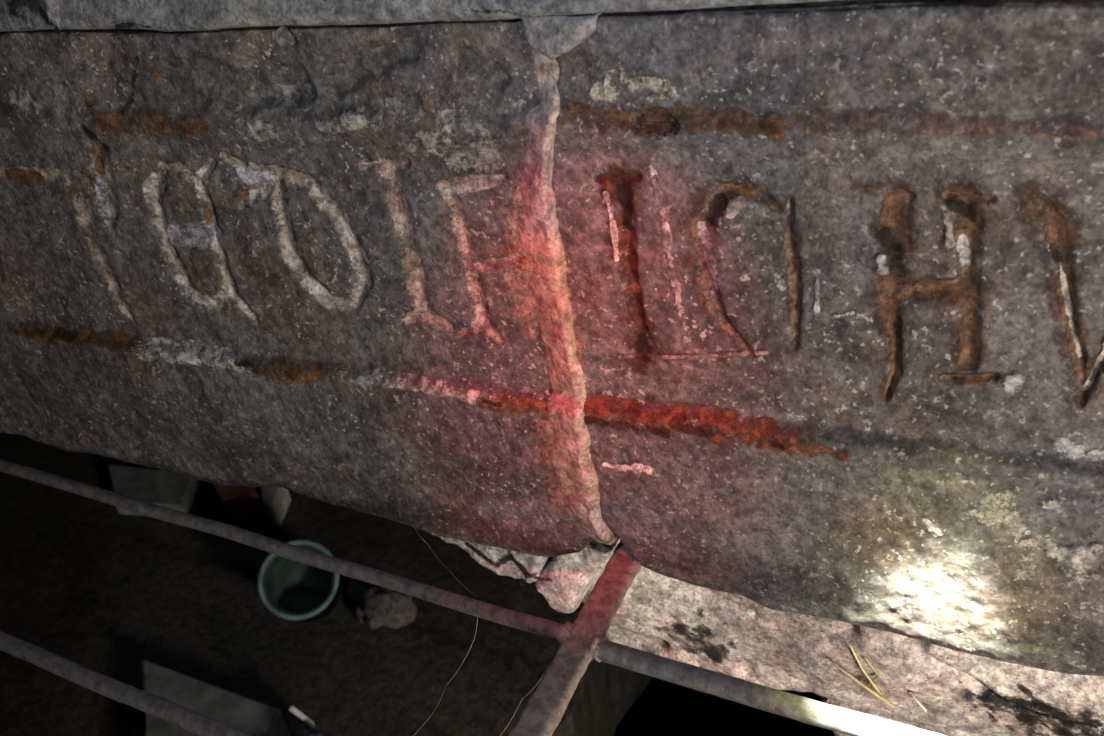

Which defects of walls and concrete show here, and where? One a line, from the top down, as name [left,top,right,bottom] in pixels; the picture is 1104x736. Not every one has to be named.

crack [115,21,150,29]
rust [86,98,210,138]
rust [556,101,1104,144]
crack [465,9,618,545]
rust [8,322,146,354]
rust [234,356,347,384]
rust [476,391,549,418]
rust [583,393,850,462]